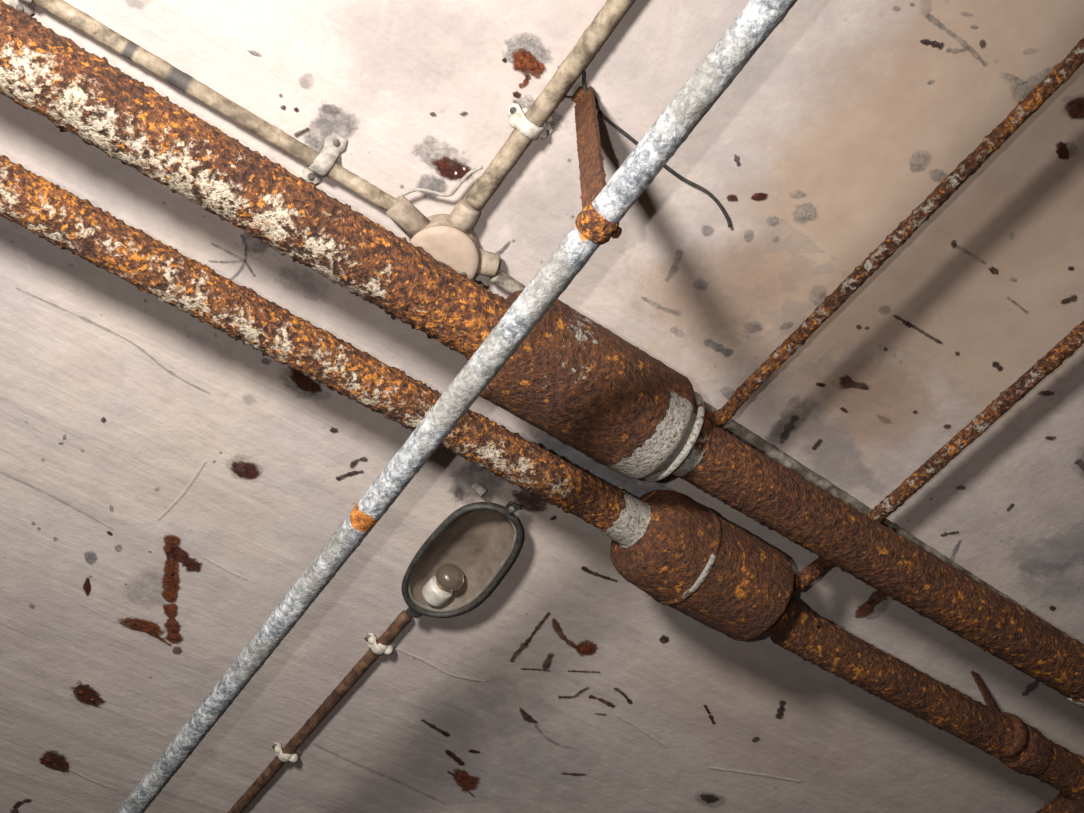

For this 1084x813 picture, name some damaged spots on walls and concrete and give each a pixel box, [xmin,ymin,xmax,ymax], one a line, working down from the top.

rust [119,535,202,654]
rust [510,612,597,672]
rust [558,687,633,716]